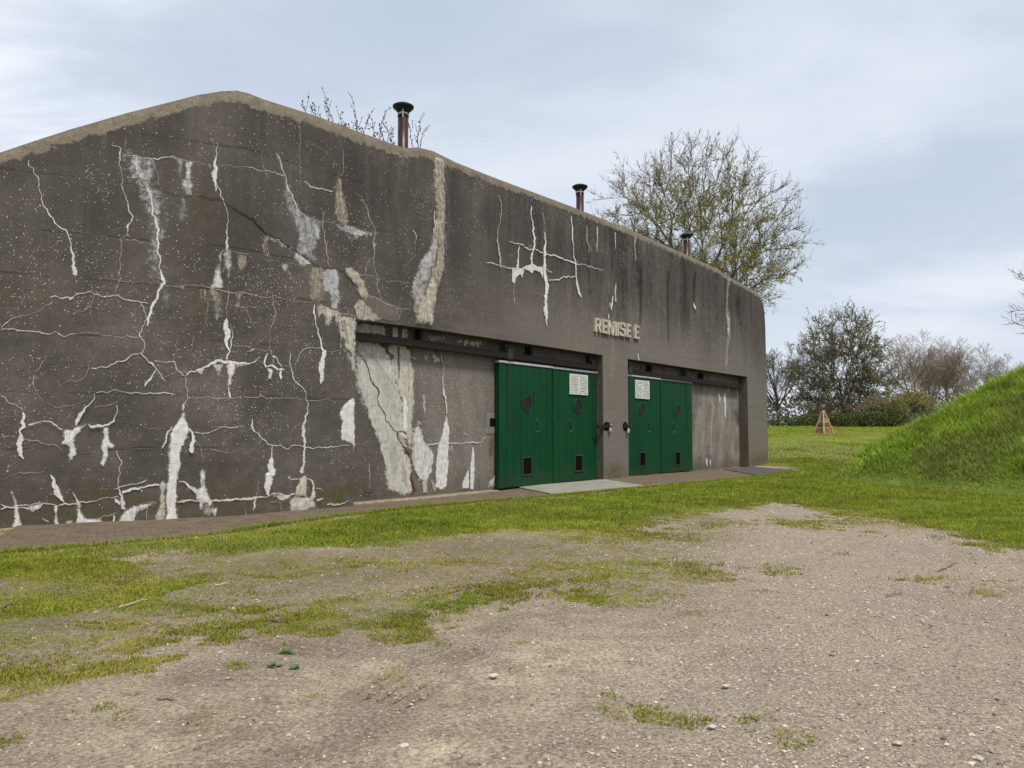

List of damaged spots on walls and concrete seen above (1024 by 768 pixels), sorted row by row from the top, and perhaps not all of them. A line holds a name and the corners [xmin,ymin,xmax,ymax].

efflorescence [130,159,163,270]
crack [2,144,408,515]
efflorescence [276,154,484,495]
crack [497,196,600,298]